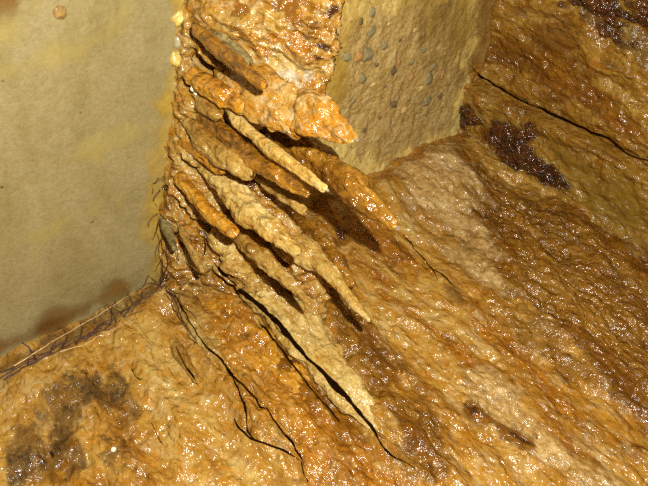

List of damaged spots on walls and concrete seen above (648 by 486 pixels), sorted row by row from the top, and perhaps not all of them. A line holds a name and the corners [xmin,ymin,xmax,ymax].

damp [277,70,313,88]
rust [470,0,646,138]
crack [468,63,648,161]
damp [146,194,164,243]
crack [172,289,309,482]
crack [204,238,415,469]
damp [201,288,450,486]